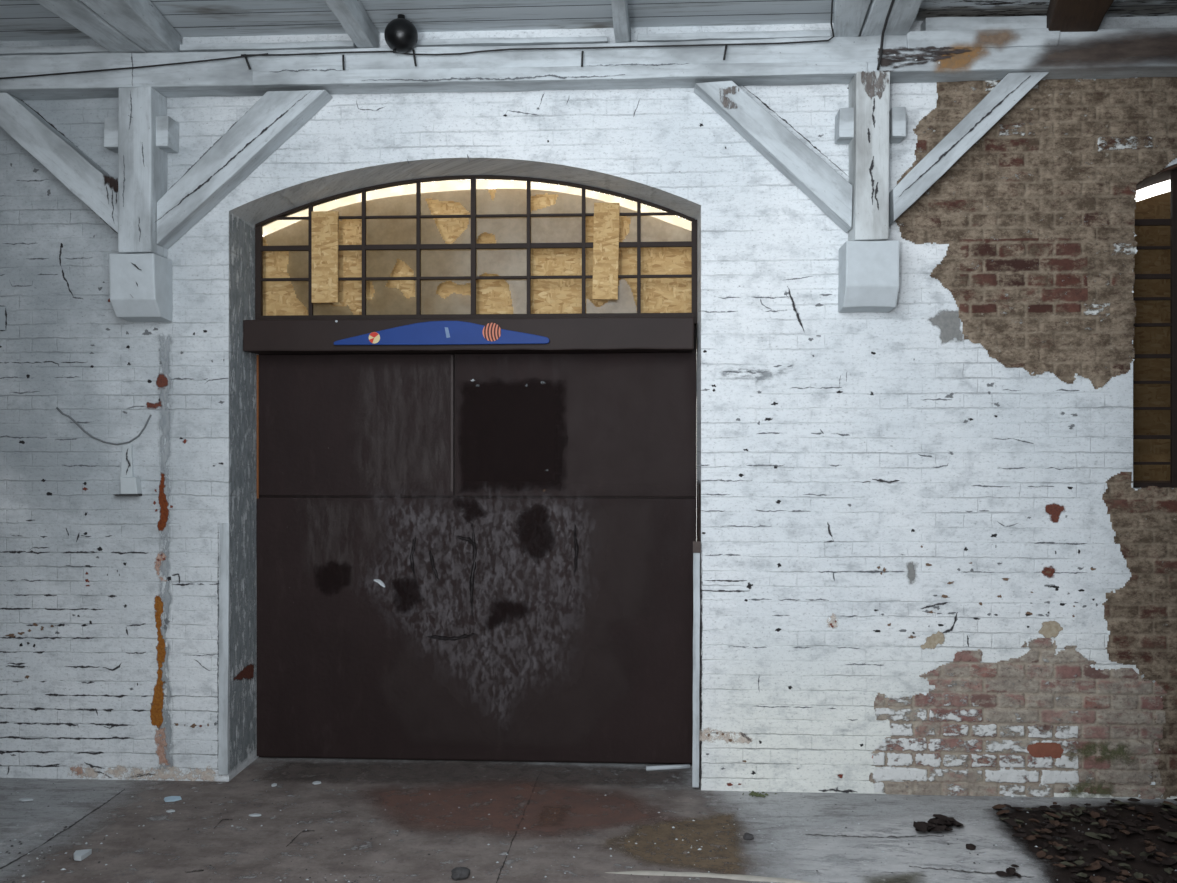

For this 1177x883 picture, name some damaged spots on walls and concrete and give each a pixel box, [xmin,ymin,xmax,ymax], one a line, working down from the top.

peeling [861,46,970,143]
peeling [869,156,879,210]
crack [0,243,83,287]
flaking render [895,77,1177,391]
corrosion [153,473,173,531]
corrosion [155,553,166,581]
corrosion [150,595,217,728]
flaking render [860,472,1177,799]
crack [496,768,542,883]